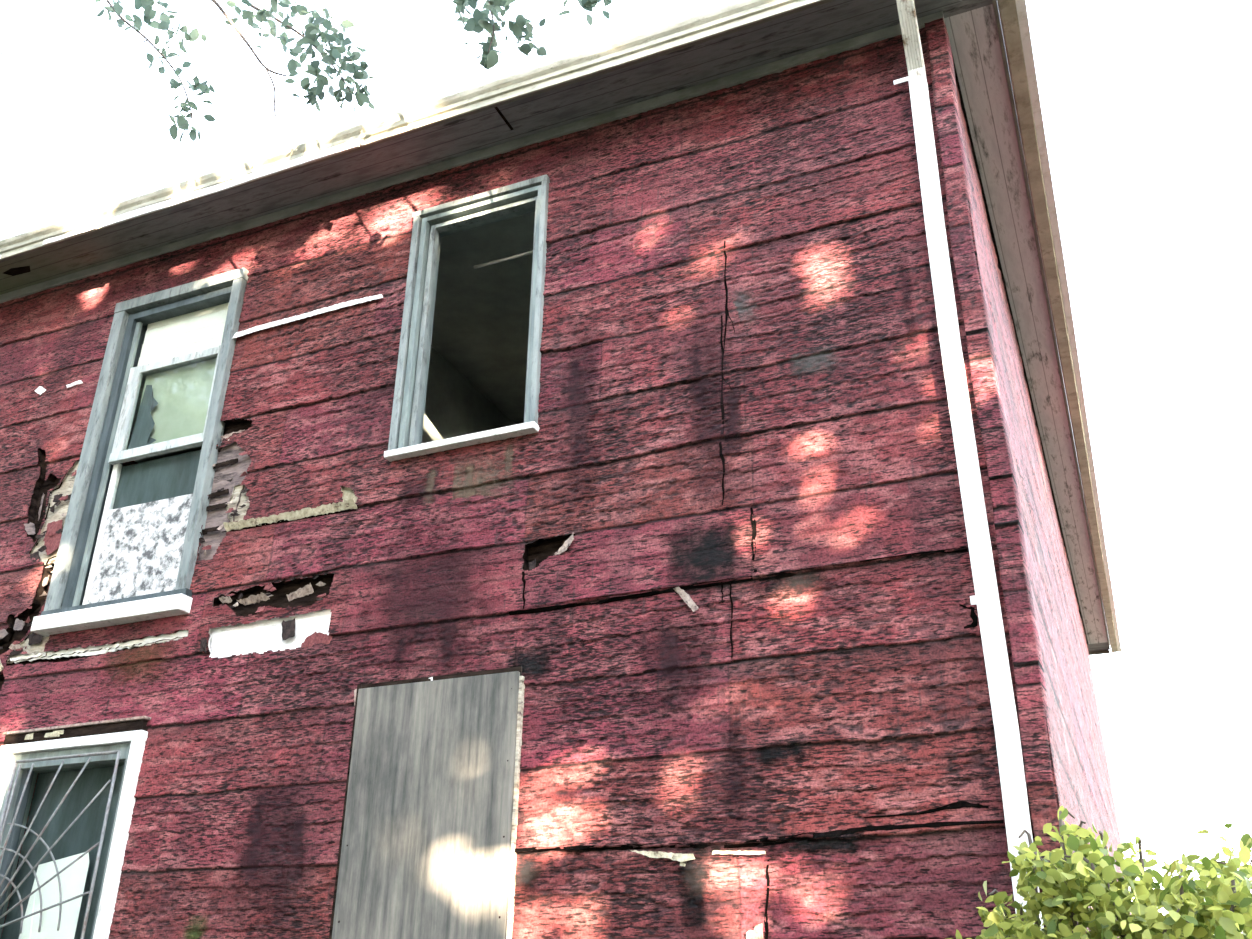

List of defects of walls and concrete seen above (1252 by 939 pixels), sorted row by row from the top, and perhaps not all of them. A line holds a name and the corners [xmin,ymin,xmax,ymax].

crack [719,241,757,663]
peeling [217,471,250,530]
peeling [555,533,574,555]
peeling [0,493,71,671]
peeling [213,573,334,648]
peeling [24,730,64,740]